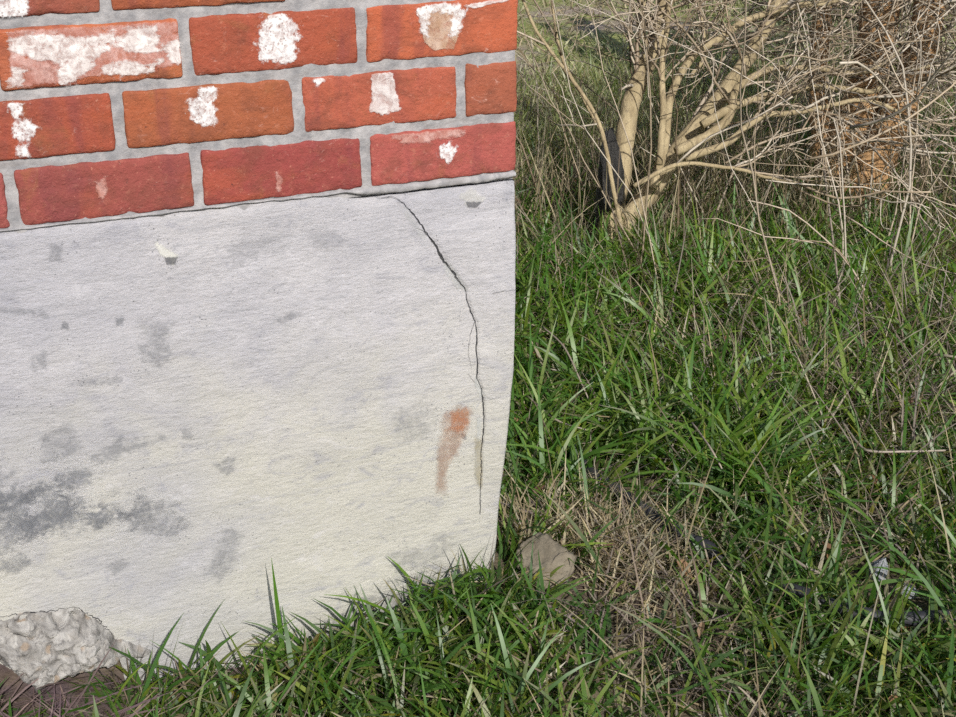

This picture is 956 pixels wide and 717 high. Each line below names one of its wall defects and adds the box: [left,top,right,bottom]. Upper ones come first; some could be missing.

crack [378,196,485,511]
spalling [0,607,151,691]